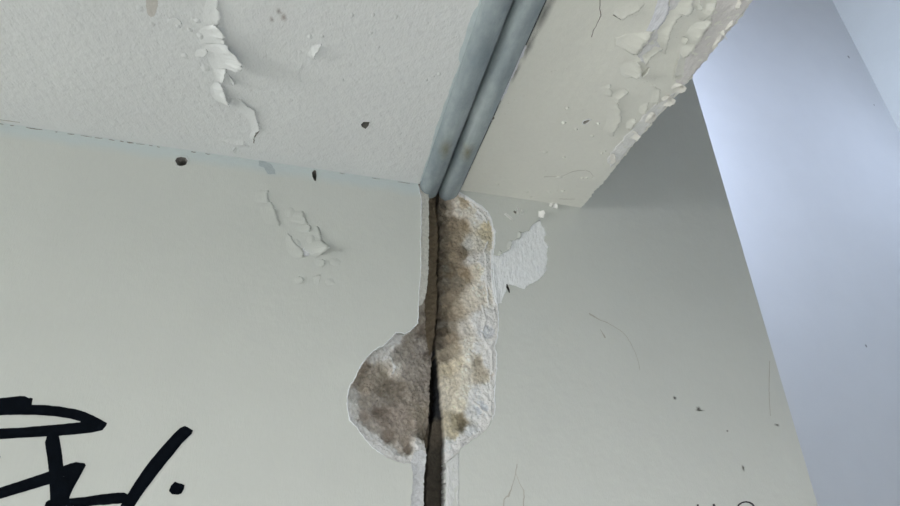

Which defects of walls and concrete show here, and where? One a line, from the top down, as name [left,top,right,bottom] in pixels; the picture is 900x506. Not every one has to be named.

peeling [195,0,260,141]
peeling [600,0,752,167]
crack [427,360,435,424]
spalling [346,185,558,506]